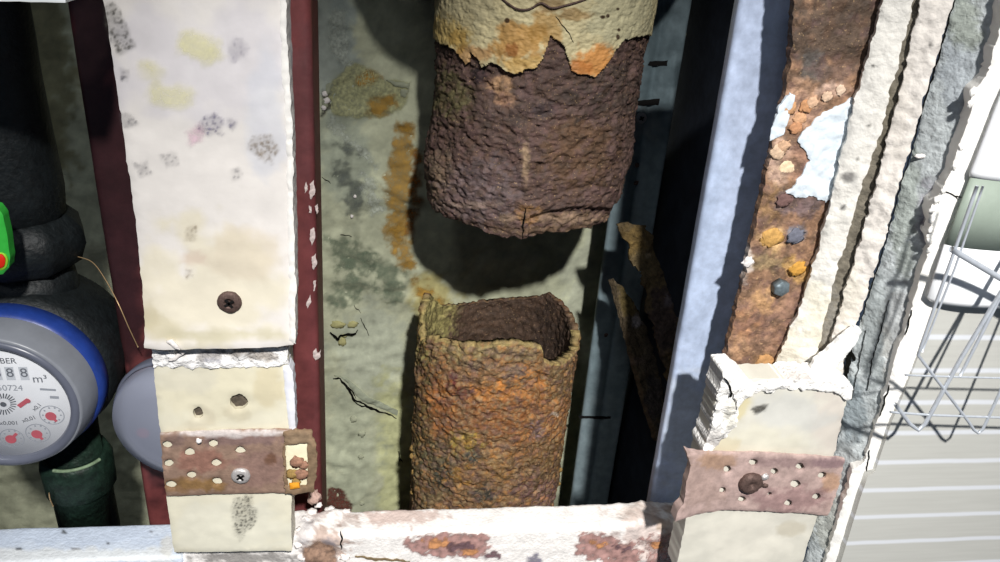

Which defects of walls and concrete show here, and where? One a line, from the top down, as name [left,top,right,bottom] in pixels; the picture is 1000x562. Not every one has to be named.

corrosion [383,124,443,305]
corrosion [608,222,679,441]
spalling [152,339,291,370]
crack [333,375,398,419]
spalling [692,353,853,451]
corrosion [403,531,501,559]
corrosion [575,532,671,562]